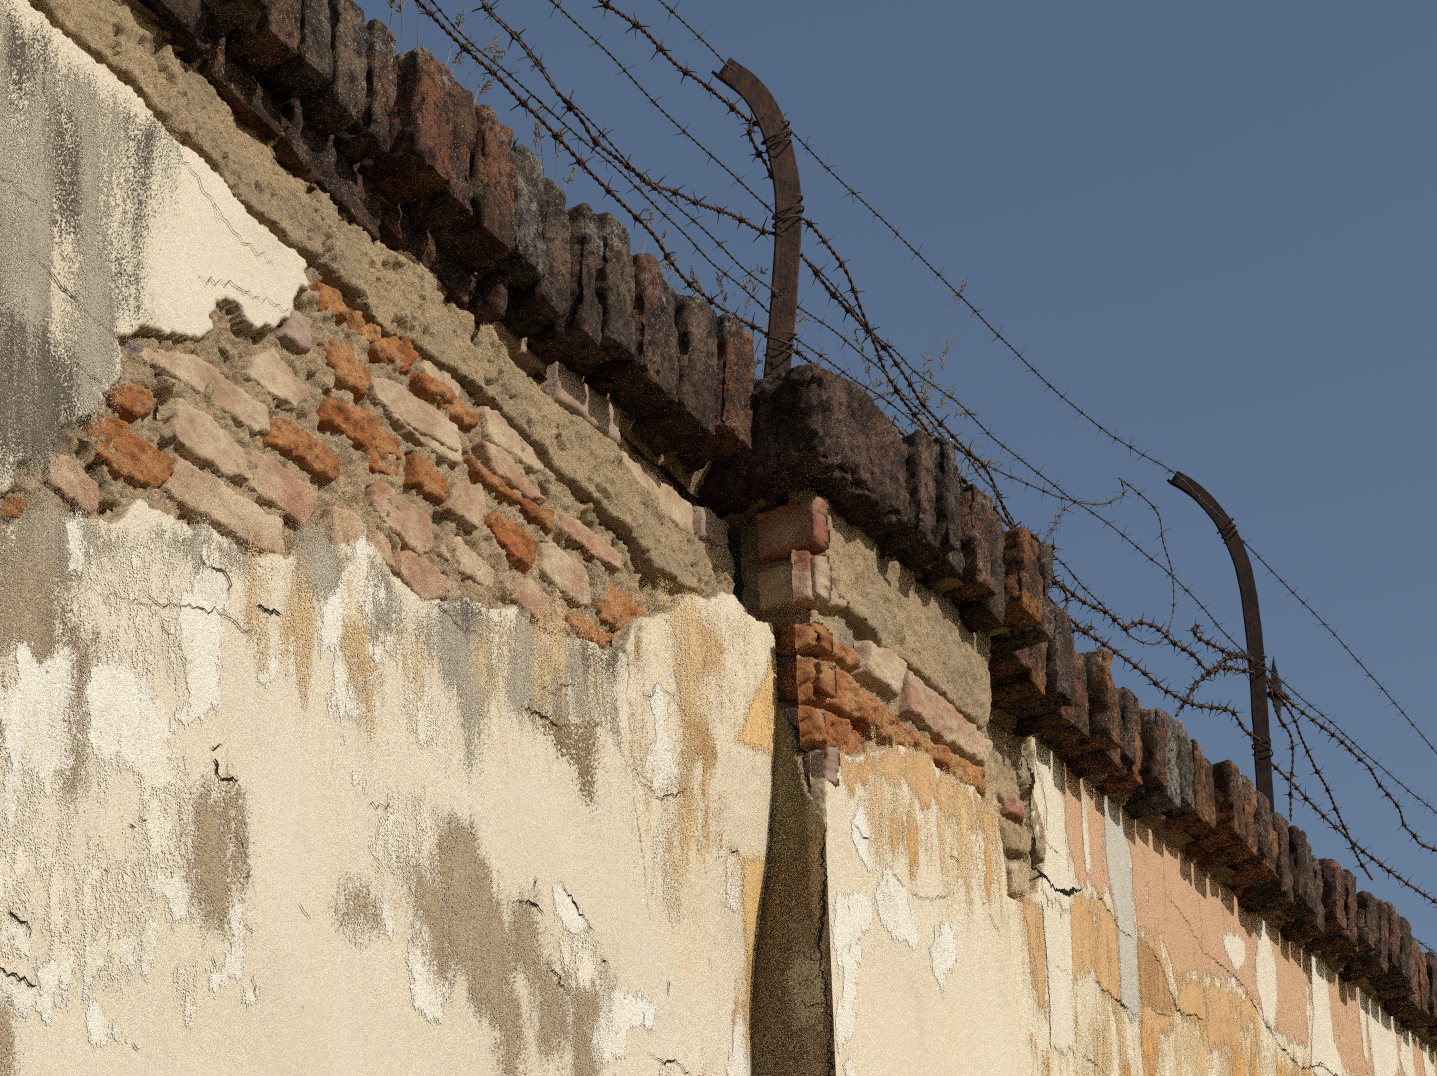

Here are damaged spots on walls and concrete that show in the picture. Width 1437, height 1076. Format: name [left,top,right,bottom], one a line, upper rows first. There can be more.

damp [0,0,627,828]
spalling [0,265,686,1076]
spalling [756,496,1046,898]
peeling [781,802,958,1076]
crack [795,792,1000,1076]
damp [1034,746,1141,1056]
peeling [1056,759,1375,1076]
damp [1222,914,1278,1034]
damp [1310,953,1347,1076]
damp [1357,986,1435,1076]
peeling [1394,1018,1437,1076]